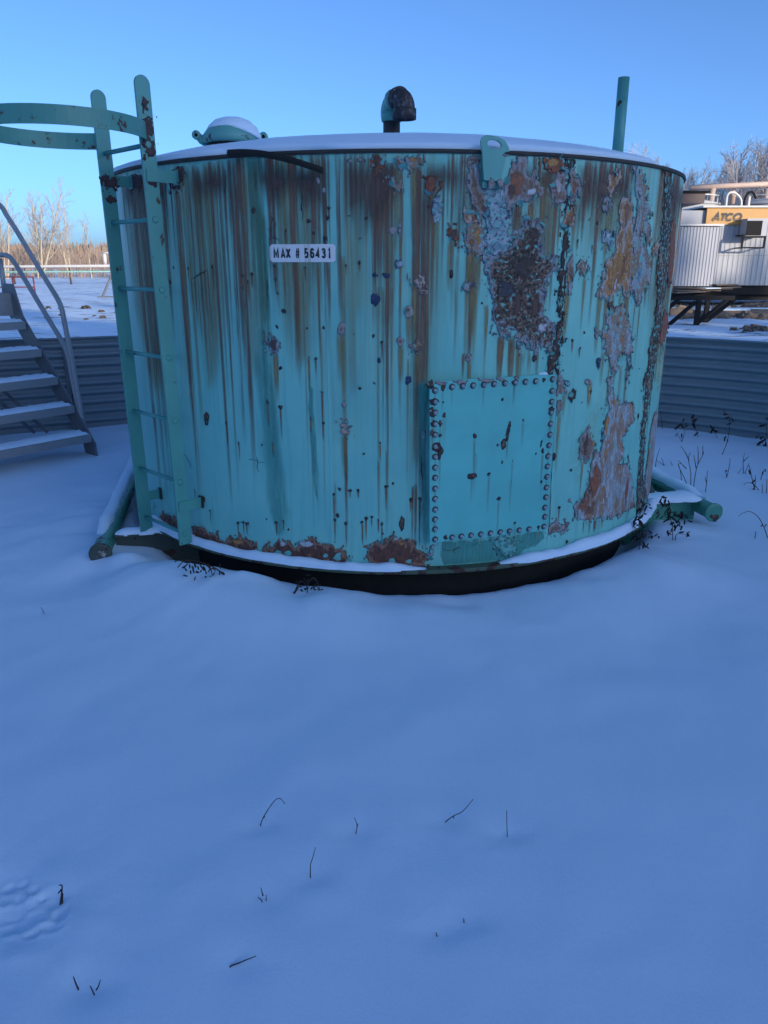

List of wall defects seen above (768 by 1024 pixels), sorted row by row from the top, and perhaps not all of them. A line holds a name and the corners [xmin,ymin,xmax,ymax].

corrosion [99,96,476,422]
peeling [425,154,673,544]
corrosion [159,510,177,528]
corrosion [191,484,430,566]